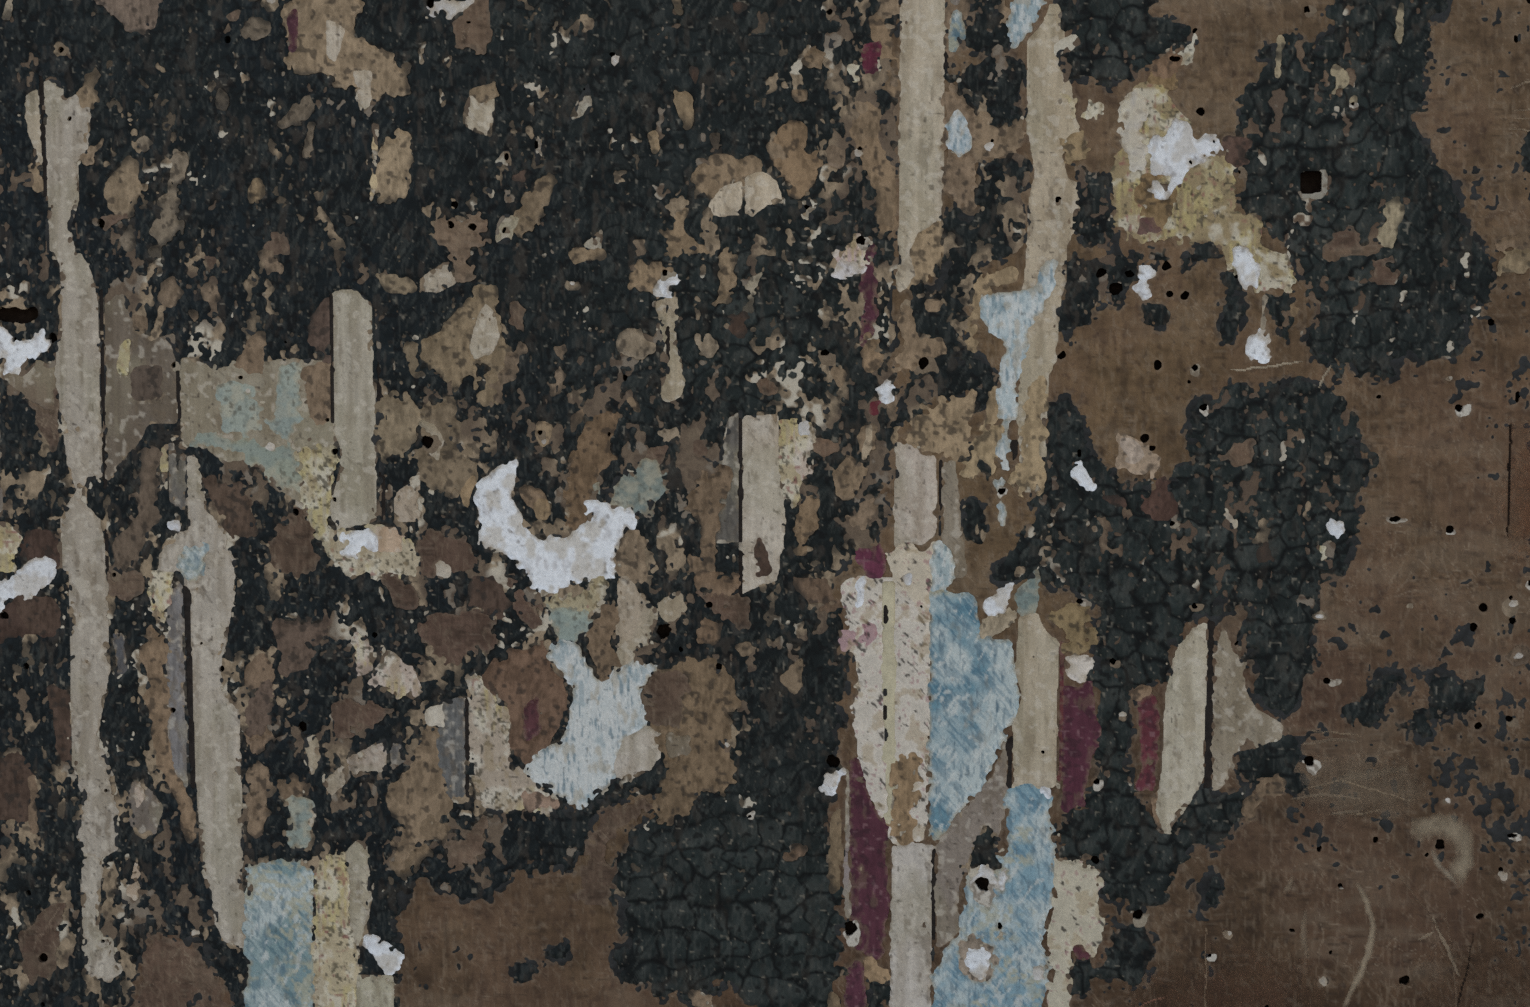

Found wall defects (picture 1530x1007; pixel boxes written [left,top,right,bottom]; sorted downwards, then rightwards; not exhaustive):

peeling [226,0,424,110]
peeling [943,0,1081,57]
peeling [25,90,44,193]
peeling [101,135,189,258]
peeling [370,128,414,204]
peeling [376,152,558,295]
peeling [756,0,1007,544]
peeling [1117,72,1191,200]
peeling [1102,433,1179,526]
peeling [0,289,573,1007]
peeling [1065,654,1116,683]
peeling [1236,735,1313,794]